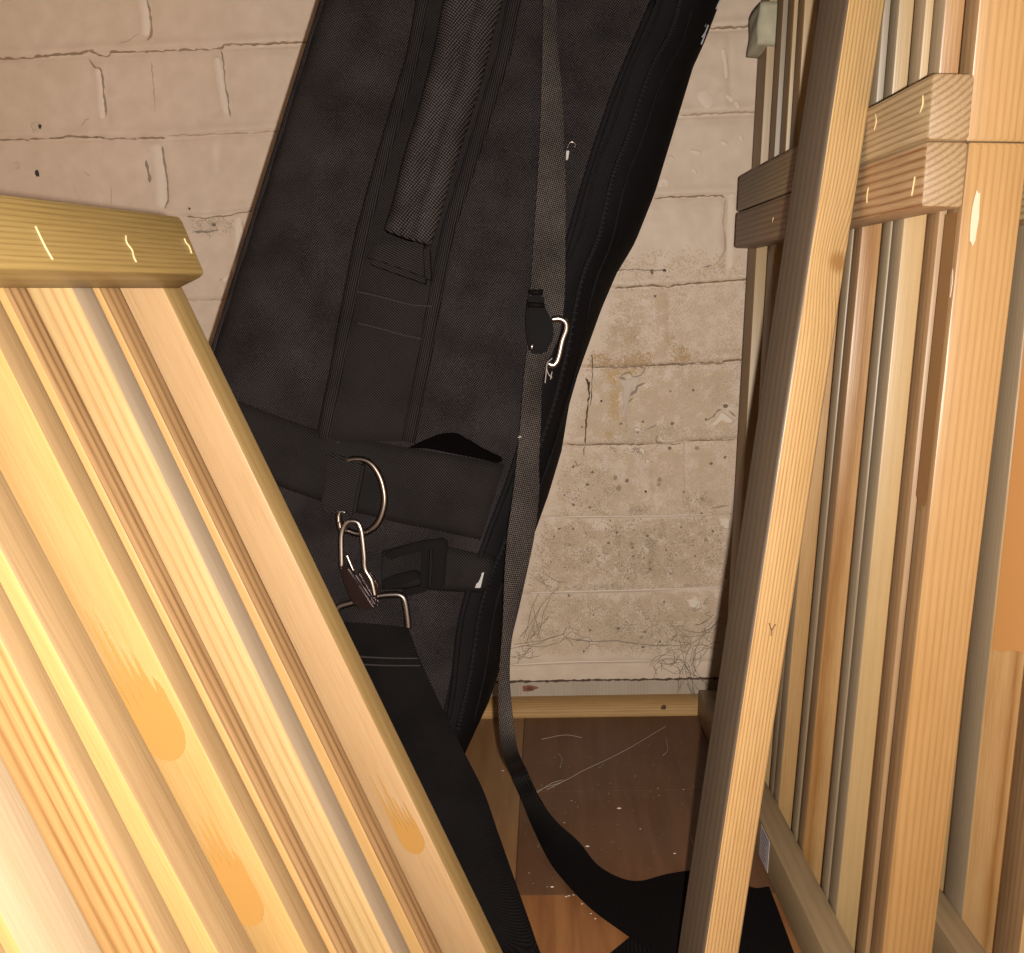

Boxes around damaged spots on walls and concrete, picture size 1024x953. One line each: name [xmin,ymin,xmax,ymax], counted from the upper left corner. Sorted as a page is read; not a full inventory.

crack [565,637,683,647]
crack [495,676,719,684]